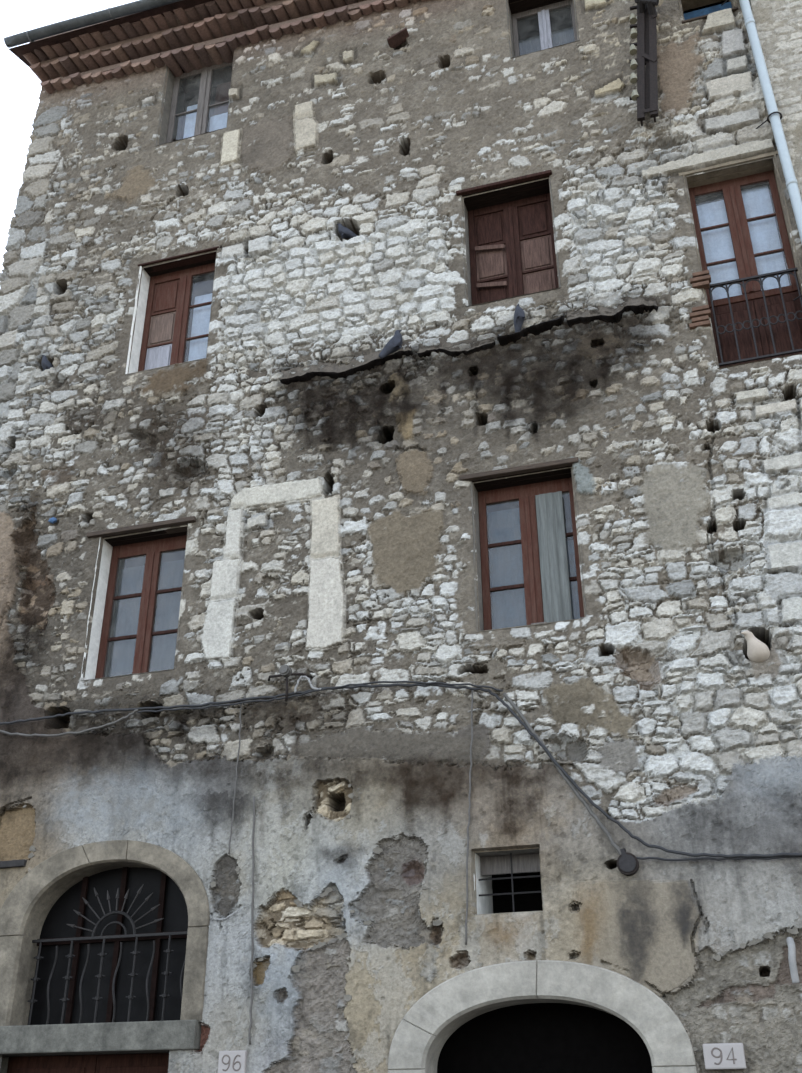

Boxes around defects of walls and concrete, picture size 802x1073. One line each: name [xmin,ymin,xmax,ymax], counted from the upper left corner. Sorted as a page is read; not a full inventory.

leakage [277,350,431,443]
leakage [441,311,652,430]
flaking render [306,777,354,829]
flaking render [210,853,242,916]
peeling [250,834,444,1073]